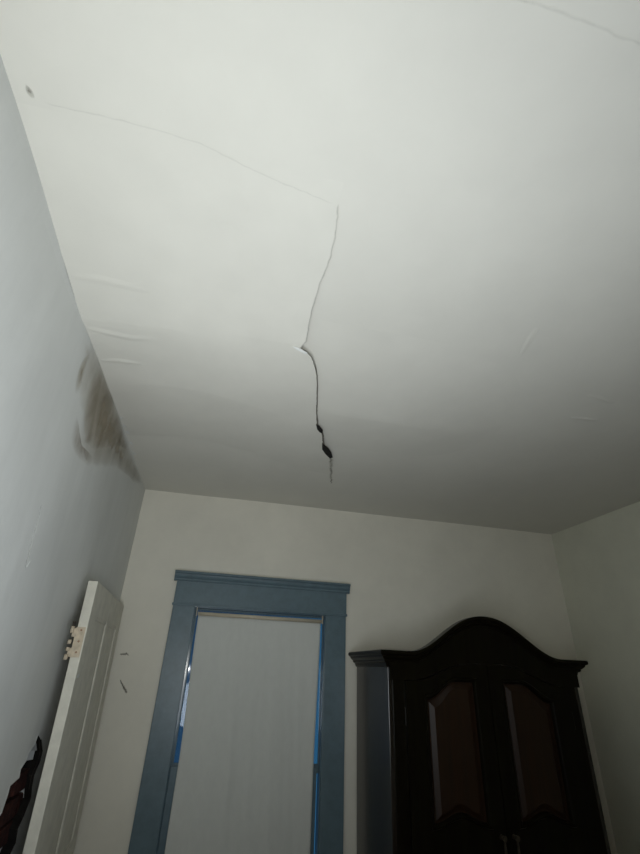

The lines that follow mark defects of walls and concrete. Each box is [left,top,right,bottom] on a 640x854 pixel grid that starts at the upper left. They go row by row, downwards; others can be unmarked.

crack [293,346,333,483]
spalling [0,735,43,854]